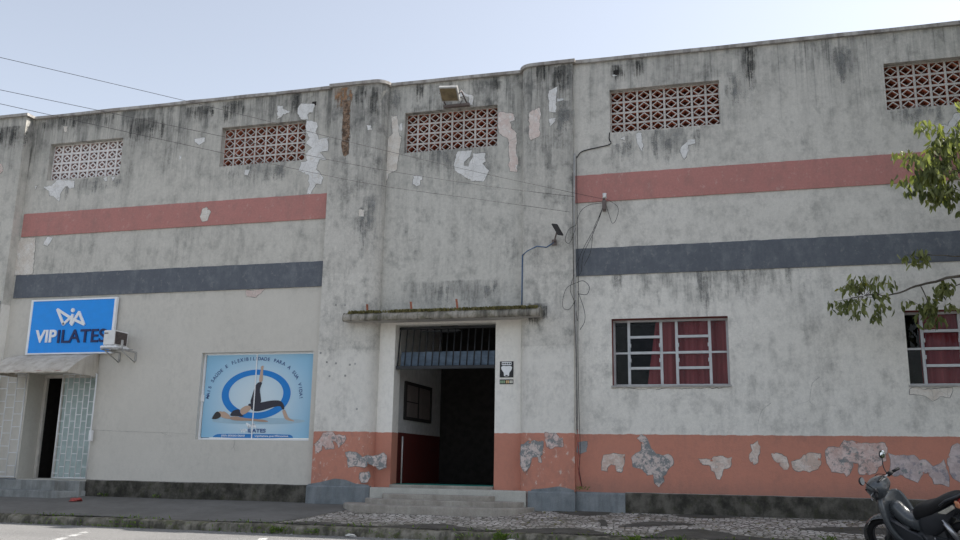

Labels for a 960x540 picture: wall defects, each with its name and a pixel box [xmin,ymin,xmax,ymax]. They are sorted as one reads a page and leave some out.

peeling [44,179,75,201]
peeling [277,103,329,194]
flaking render [341,100,351,156]
peeling [453,150,490,182]
peeling [497,111,518,172]
peeling [528,86,564,140]
peeling [314,432,387,483]
peeling [520,432,564,473]
peeling [601,434,674,487]
peeling [699,456,732,480]
peeling [749,440,960,487]